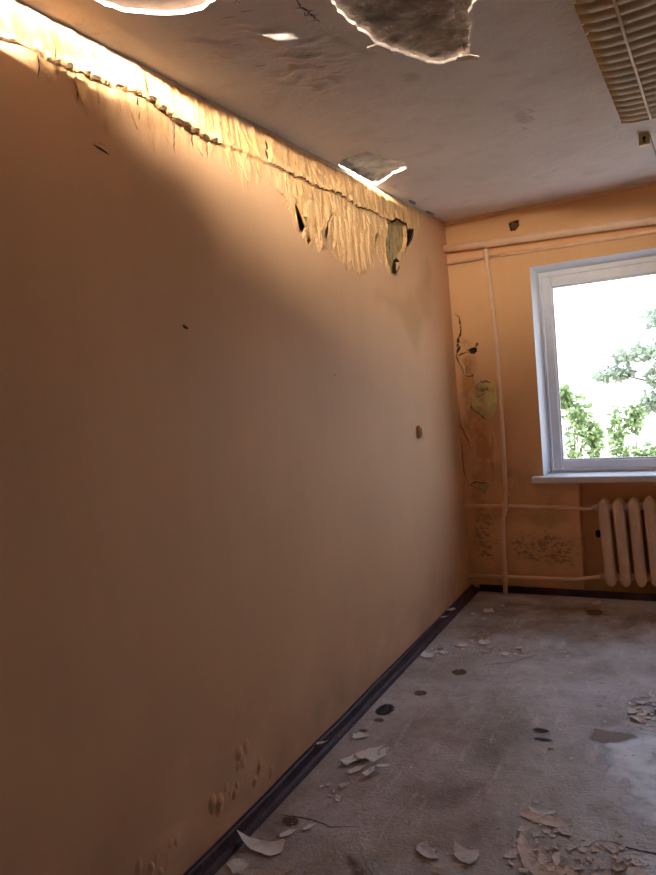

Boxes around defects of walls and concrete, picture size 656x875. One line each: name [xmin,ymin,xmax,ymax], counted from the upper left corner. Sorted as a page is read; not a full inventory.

flaking render [329,0,479,64]
crack [0,30,230,157]
peeling [0,0,435,277]
crack [265,140,392,220]
crack [454,310,468,374]
water stain [592,729,656,825]